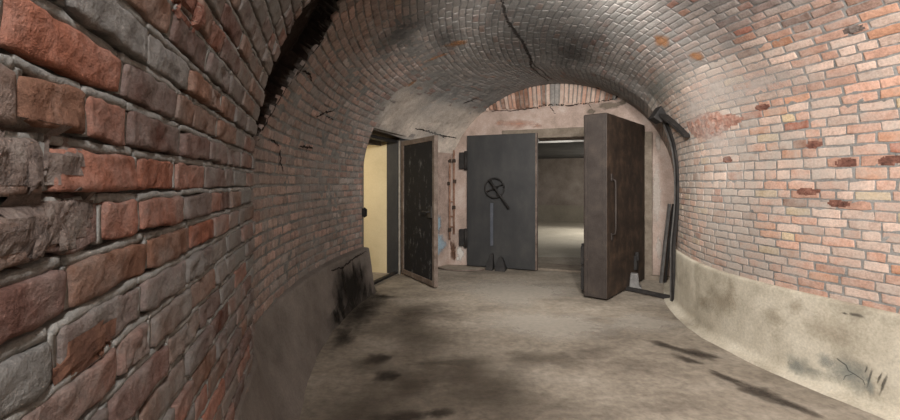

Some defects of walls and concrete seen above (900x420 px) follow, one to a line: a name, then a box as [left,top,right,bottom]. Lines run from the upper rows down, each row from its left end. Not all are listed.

crack [500,0,551,81]
crack [256,10,328,170]
crack [415,128,456,138]
spalling [687,111,744,140]
leakage [334,265,389,343]